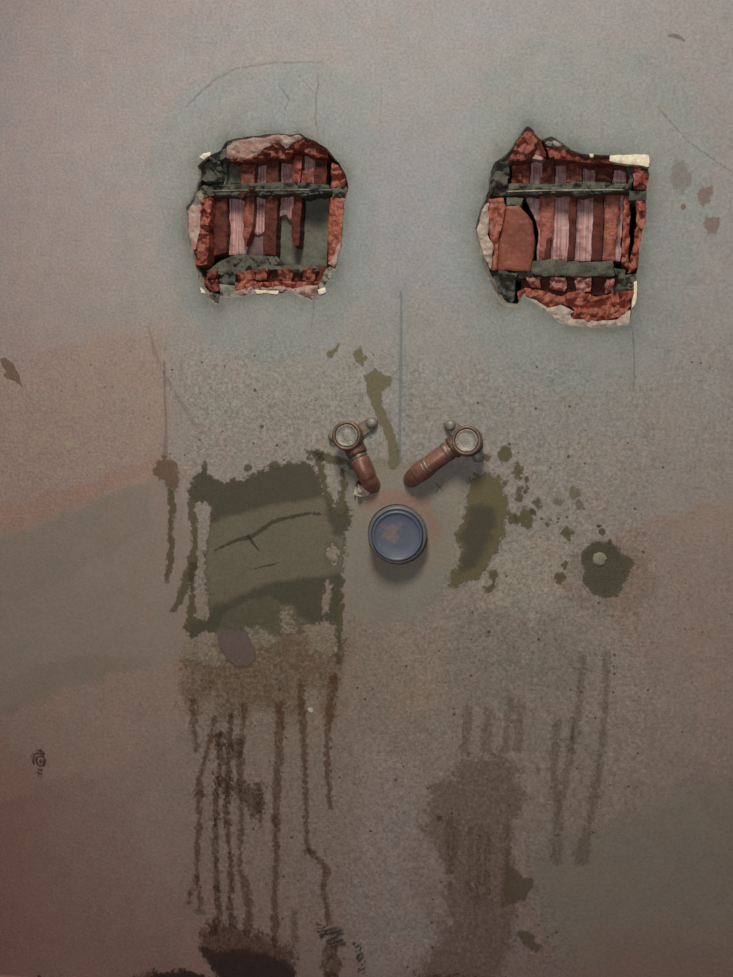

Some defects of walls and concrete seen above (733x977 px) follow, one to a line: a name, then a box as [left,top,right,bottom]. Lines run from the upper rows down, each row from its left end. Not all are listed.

spalling [186,133,349,304]
spalling [475,126,650,328]
water stain [354,347,400,469]
water stain [164,449,354,667]
crack [215,512,321,569]
water stain [447,443,583,593]
water stain [581,525,634,598]
water stain [141,919,299,977]